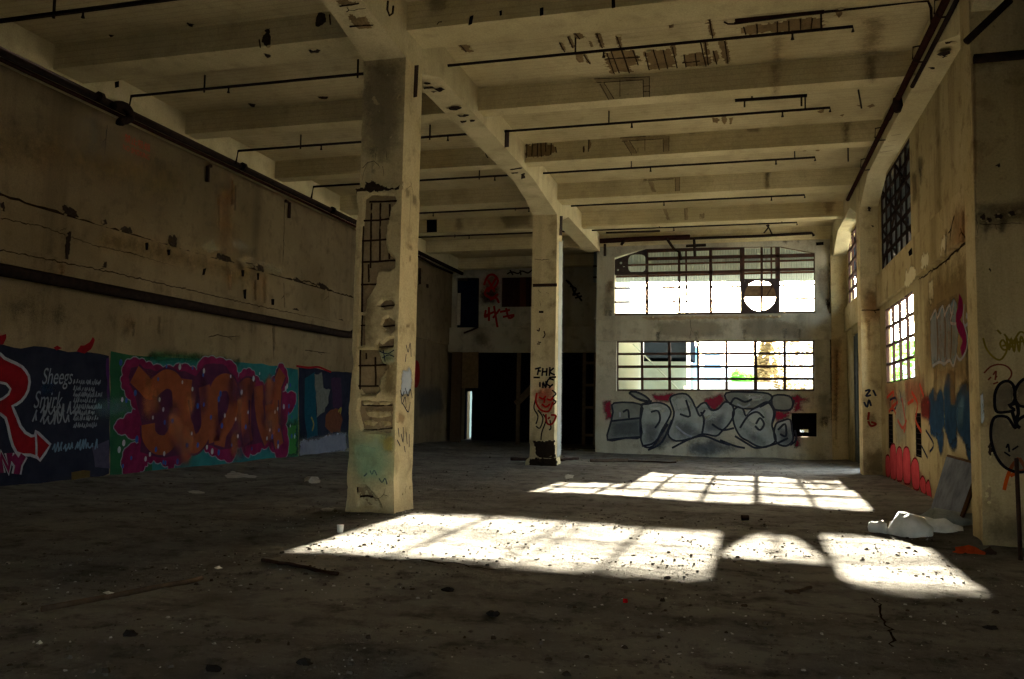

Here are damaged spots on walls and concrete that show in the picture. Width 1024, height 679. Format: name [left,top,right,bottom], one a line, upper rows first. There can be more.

spalling [559,19,732,100]
spalling [509,143,558,179]
spalling [355,178,404,433]
crack [872,598,897,647]